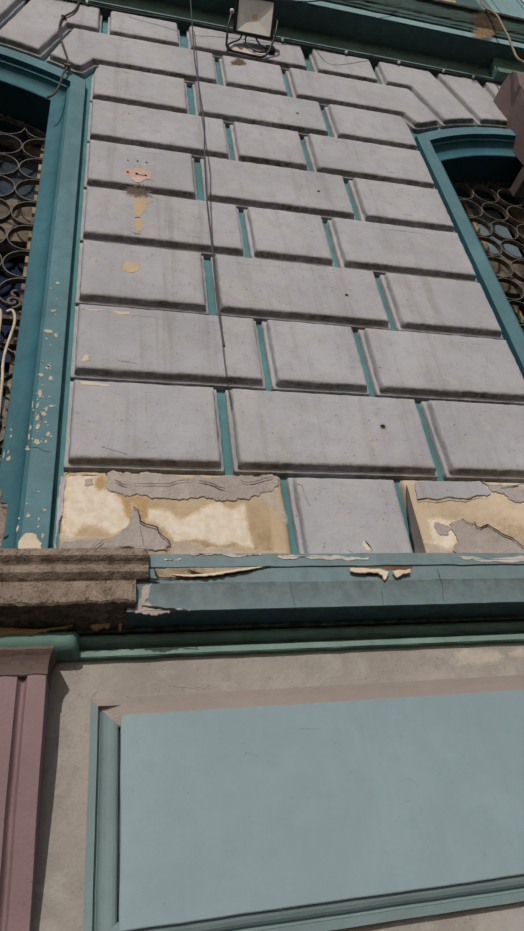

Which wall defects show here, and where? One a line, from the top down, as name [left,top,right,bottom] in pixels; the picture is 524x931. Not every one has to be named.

water stain [80,0,234,30]
water stain [273,25,493,80]
peeling [132,197,154,234]
peeling [25,361,56,451]
spalling [0,471,413,581]
spalling [406,481,524,563]